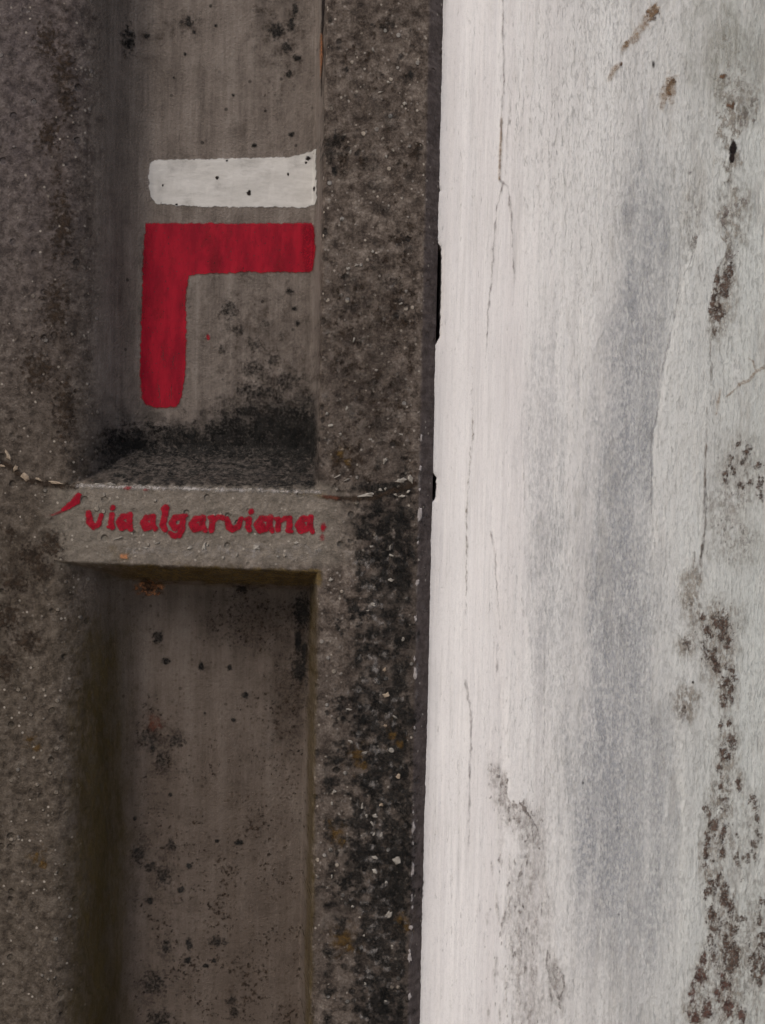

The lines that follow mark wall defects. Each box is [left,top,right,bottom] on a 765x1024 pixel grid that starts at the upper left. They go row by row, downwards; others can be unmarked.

corrosion [623,3,660,48]
corrosion [662,78,676,99]
corrosion [715,61,746,182]
damp [92,185,424,1024]